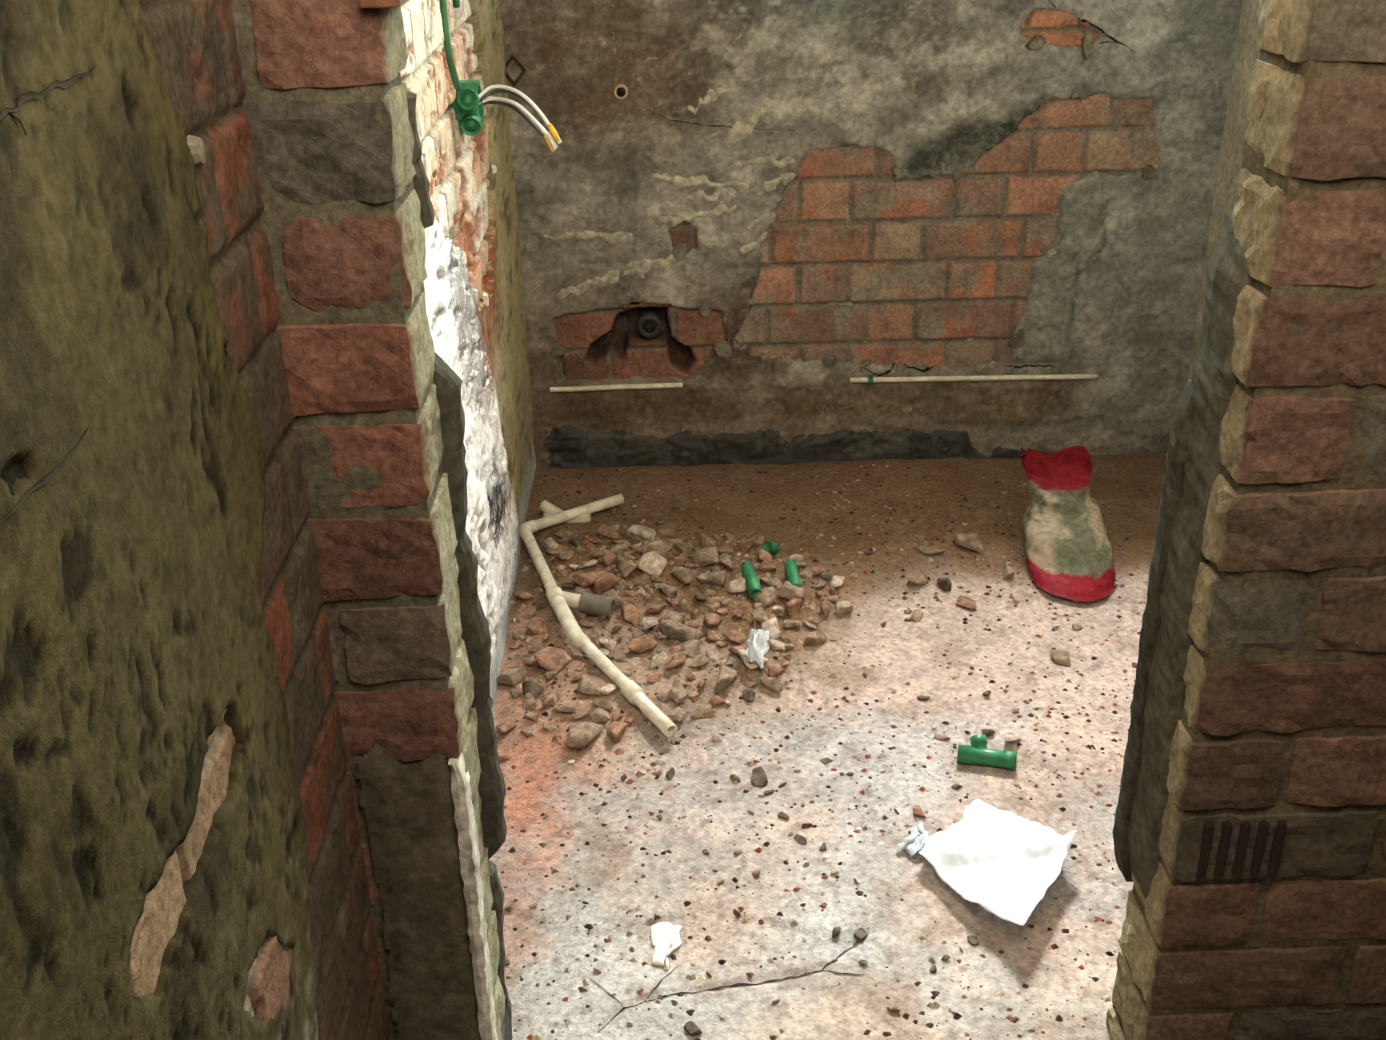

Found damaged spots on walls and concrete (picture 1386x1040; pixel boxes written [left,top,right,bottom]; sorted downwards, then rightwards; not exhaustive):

flaking render [1019,10,1100,61]
flaking render [400,0,497,307]
flaking render [551,91,1161,384]
leakage [449,249,489,410]
flaking render [130,0,390,1040]
leakage [487,470,506,541]
spalling [937,577,952,591]
flaking render [1112,213,1253,899]
spalling [742,689,756,702]